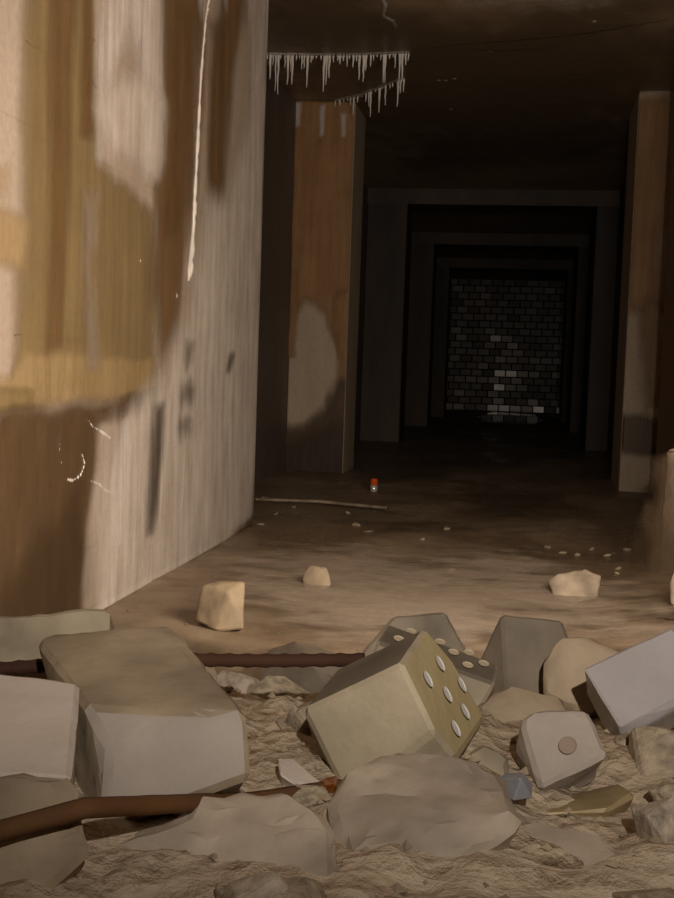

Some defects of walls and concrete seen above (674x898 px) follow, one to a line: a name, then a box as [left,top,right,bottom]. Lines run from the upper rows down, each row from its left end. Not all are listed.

water stain [288,0,644,163]
water stain [0,0,269,617]
water stain [284,381,345,474]
water stain [241,555,664,641]